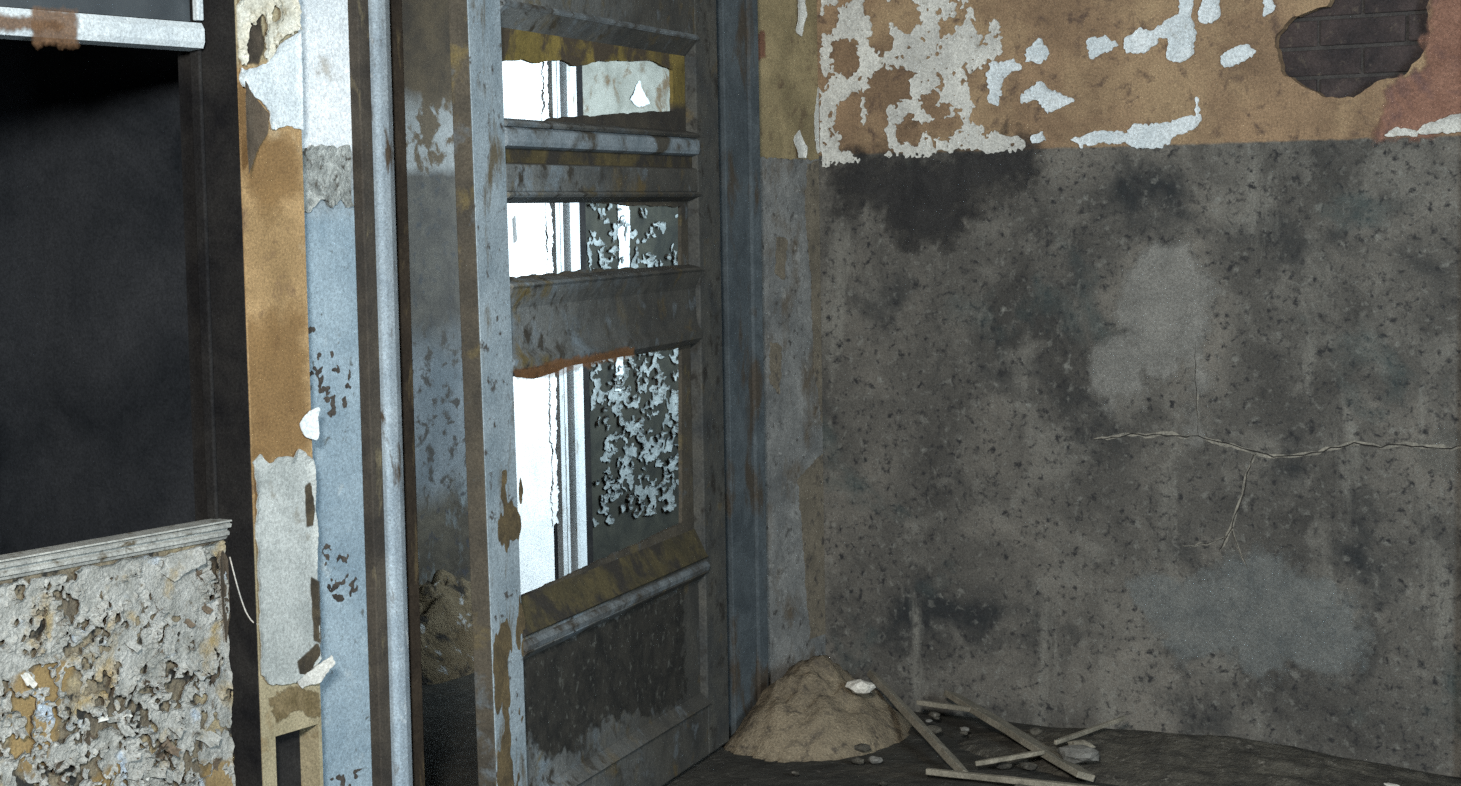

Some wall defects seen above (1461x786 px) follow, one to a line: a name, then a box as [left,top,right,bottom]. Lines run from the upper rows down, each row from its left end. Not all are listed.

peeling [236,0,354,213]
peeling [1071,97,1202,149]
peeling [1086,0,1221,63]
peeling [1220,44,1256,68]
peeling [1263,0,1276,17]
flaking render [1279,0,1461,141]
peeling [758,0,1075,423]
peeling [252,351,358,722]
peeling [498,470,523,553]
peeling [0,541,236,786]
peeling [493,595,526,786]